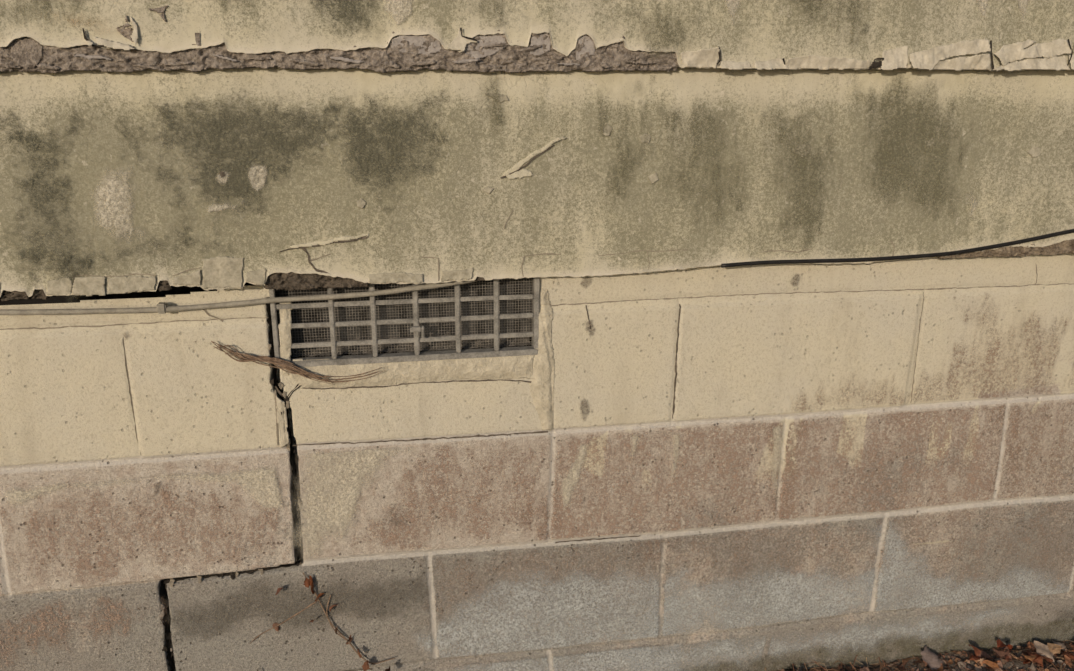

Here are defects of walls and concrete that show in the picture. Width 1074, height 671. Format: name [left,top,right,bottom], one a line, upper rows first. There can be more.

spalling [0,0,1074,73]
damp [1,113,91,298]
peeling [1,256,423,301]
damp [158,96,445,212]
peeling [441,268,485,282]
peeling [500,136,566,179]
damp [868,77,949,210]
spalling [938,239,1074,259]
damp [27,483,278,582]
crack [0,303,548,671]
damp [300,449,396,557]
damp [370,320,1071,671]